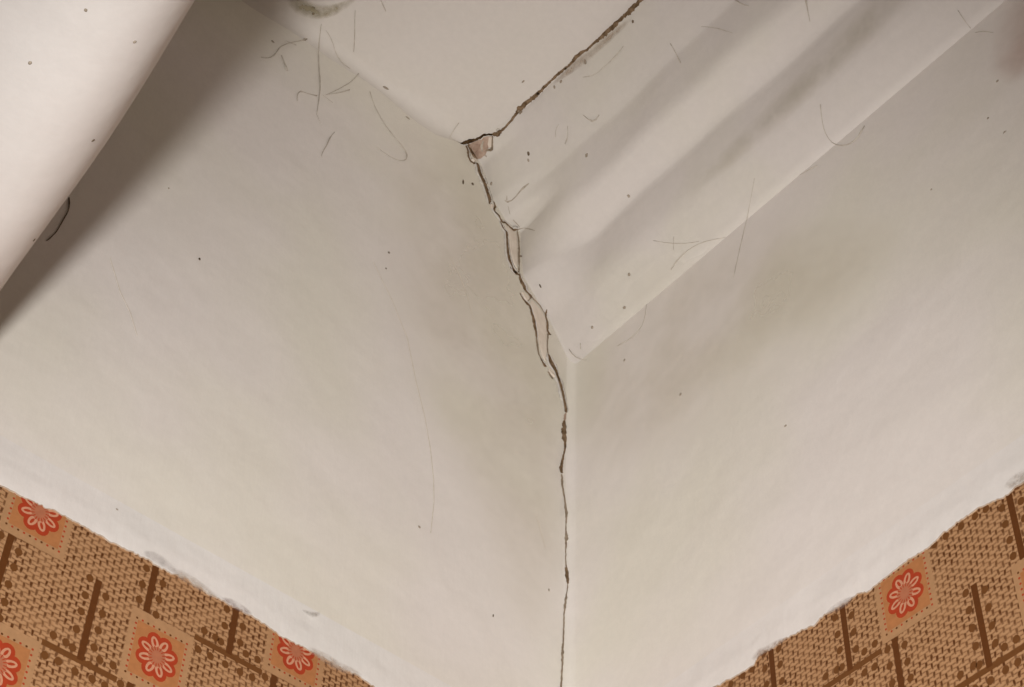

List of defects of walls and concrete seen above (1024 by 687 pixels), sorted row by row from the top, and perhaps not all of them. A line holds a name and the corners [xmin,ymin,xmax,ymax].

spalling [468,136,493,162]
crack [460,0,643,687]